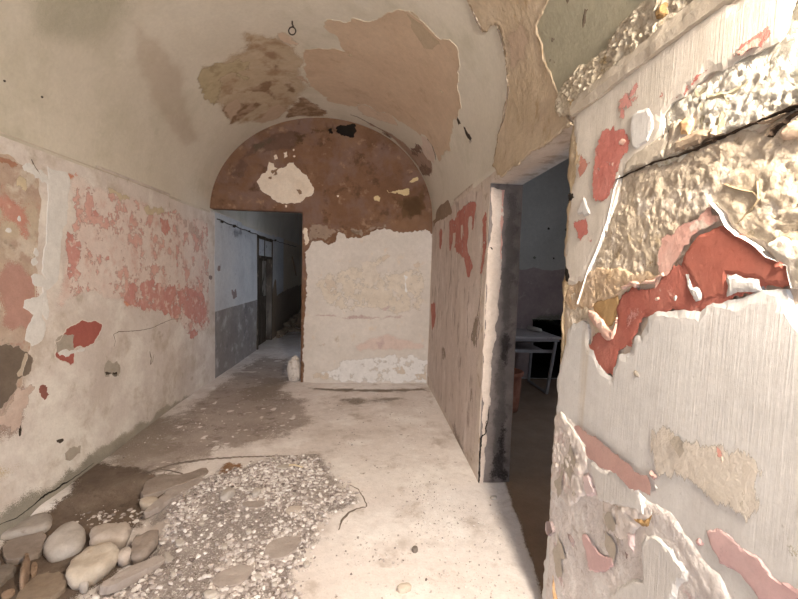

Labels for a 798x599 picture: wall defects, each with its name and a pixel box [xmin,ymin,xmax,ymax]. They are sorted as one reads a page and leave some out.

peeling [0,153,50,442]
peeling [56,173,221,340]
flaking render [302,9,472,163]
peeling [433,200,487,278]
flaking render [467,0,798,376]
crack [615,103,798,180]
crack [1,465,91,524]
flaking render [545,418,798,599]